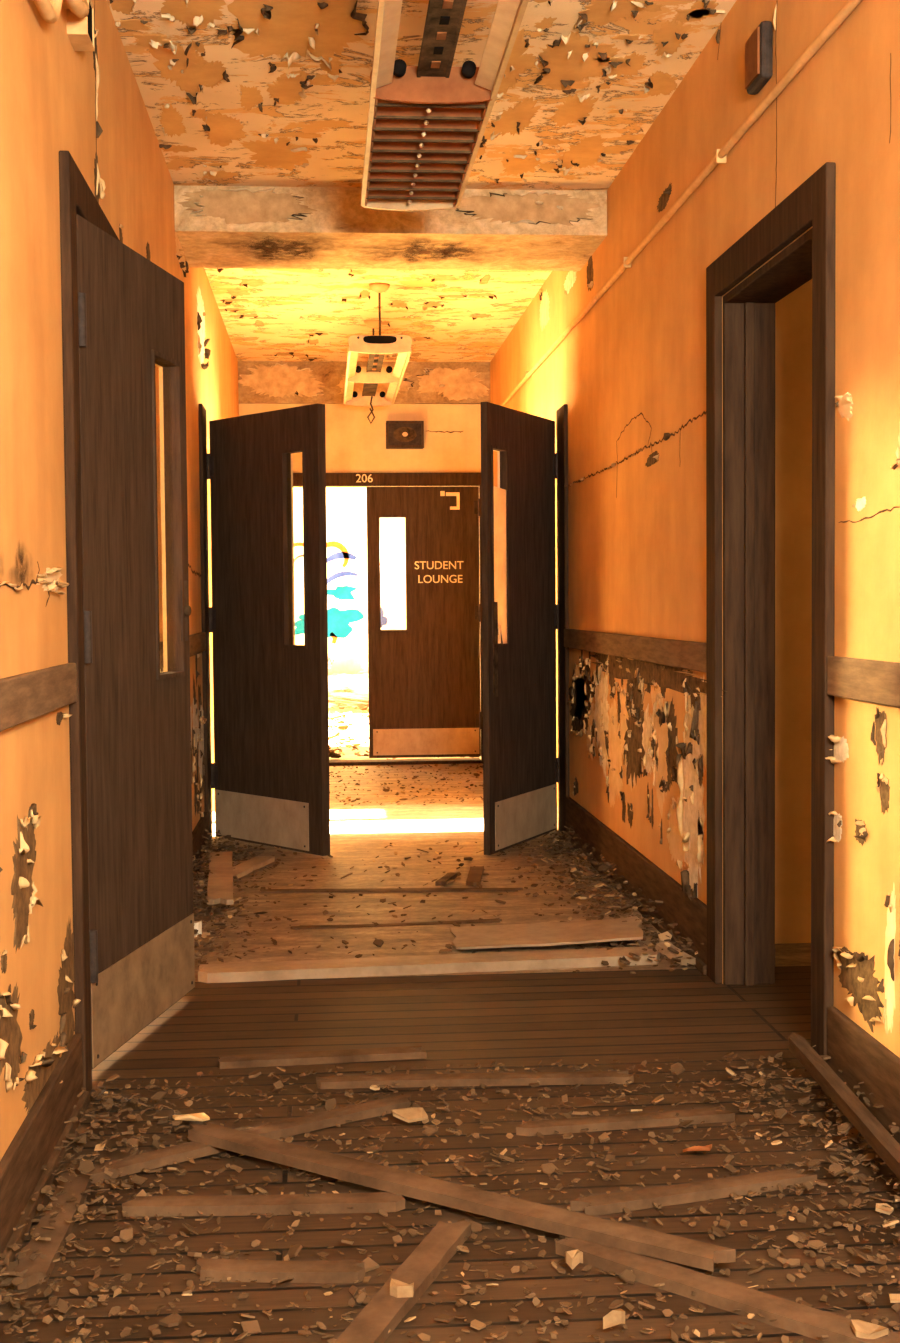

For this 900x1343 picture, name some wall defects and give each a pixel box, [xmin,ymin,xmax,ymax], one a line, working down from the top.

peeling [94,154,106,203]
peeling [109,0,369,224]
peeling [456,0,726,226]
crack [565,411,706,498]
crack [839,506,900,523]
flaking render [190,654,207,818]
flaking render [568,650,727,902]
peeling [825,735,849,764]
peeling [827,811,868,846]
flaking render [870,707,890,814]
peeling [0,803,81,1114]
peeling [832,884,900,1035]